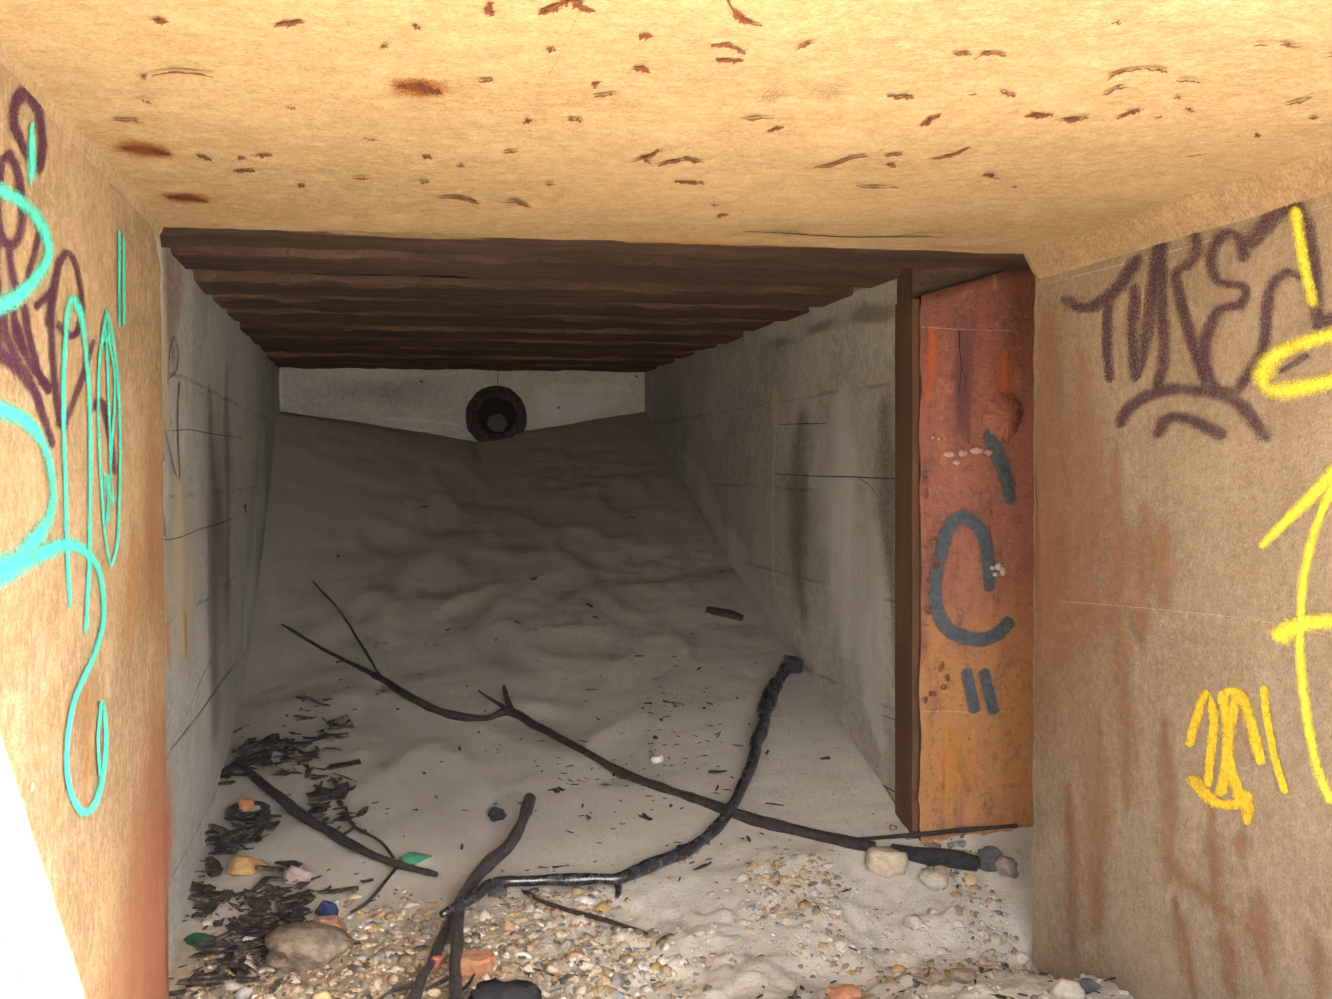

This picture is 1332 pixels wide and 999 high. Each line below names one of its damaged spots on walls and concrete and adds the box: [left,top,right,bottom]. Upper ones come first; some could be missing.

rust [538,0,595,15]
rust [727,0,762,27]
rust [711,43,746,64]
rust [385,76,450,100]
rust [110,139,177,160]
rust [157,191,218,205]
rust [923,308,979,467]
rust [1161,803,1280,999]